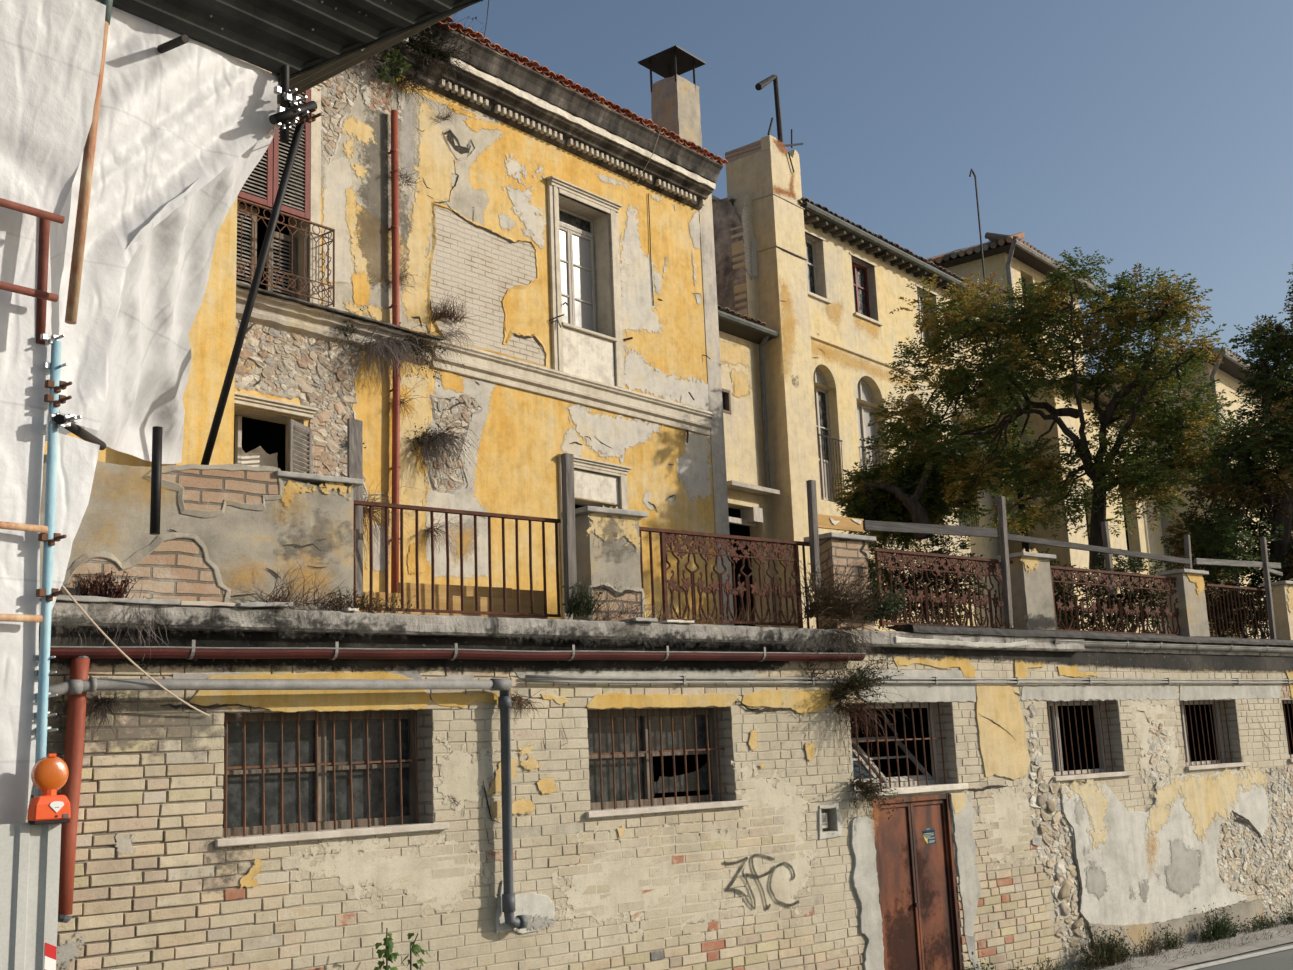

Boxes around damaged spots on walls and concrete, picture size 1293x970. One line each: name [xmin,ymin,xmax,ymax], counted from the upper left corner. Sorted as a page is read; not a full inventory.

flaking render [304,64,548,367]
peeling [595,173,709,411]
flaking render [561,404,664,463]
flaking render [587,431,712,552]
flaking render [59,532,231,603]
flaking render [1128,699,1293,922]
corrosion [887,844,952,970]